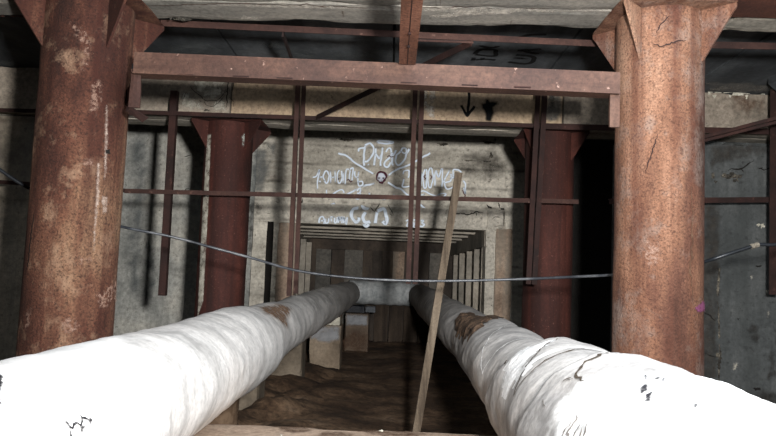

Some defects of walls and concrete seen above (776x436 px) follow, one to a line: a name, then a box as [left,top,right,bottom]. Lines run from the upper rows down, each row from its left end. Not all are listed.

crack [728,161,770,180]